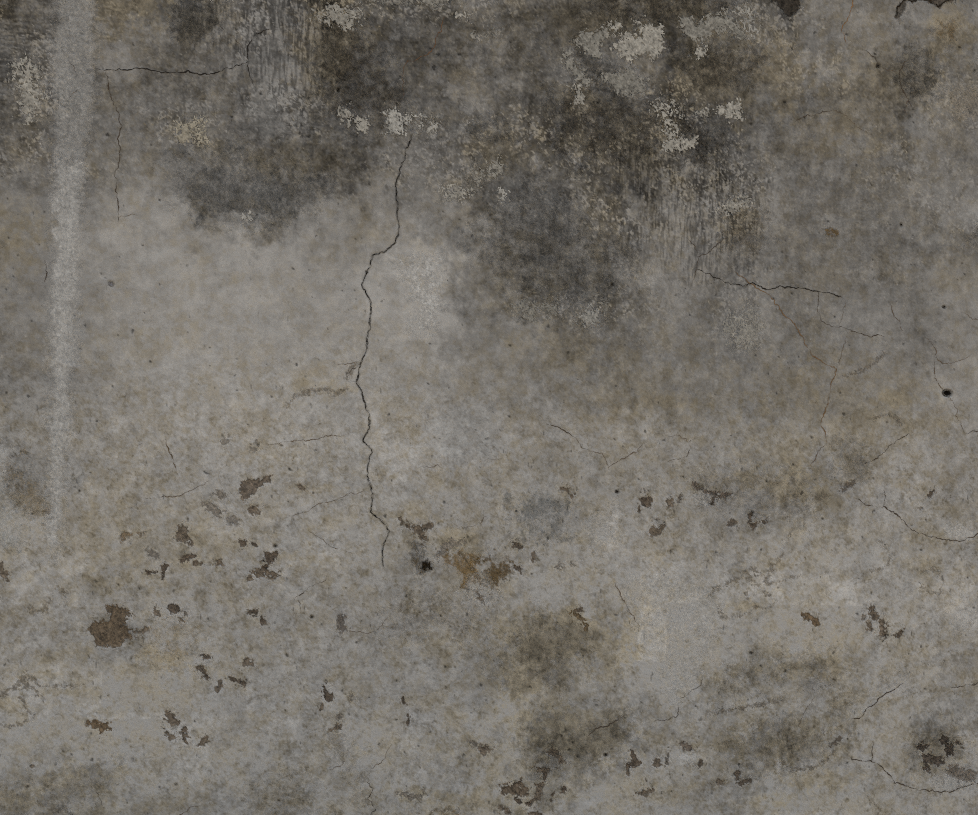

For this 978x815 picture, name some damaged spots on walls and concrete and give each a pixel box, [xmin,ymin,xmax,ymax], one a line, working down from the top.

crack [99,26,268,221]
crack [268,141,410,560]
crack [688,238,903,464]
crack [927,338,978,434]
spalling [201,475,273,526]
crack [856,491,978,542]
spalling [239,539,281,581]
spalling [88,604,150,648]
spalling [196,654,247,693]
spalling [163,710,209,747]
spalling [498,747,567,815]
spalling [916,735,976,782]